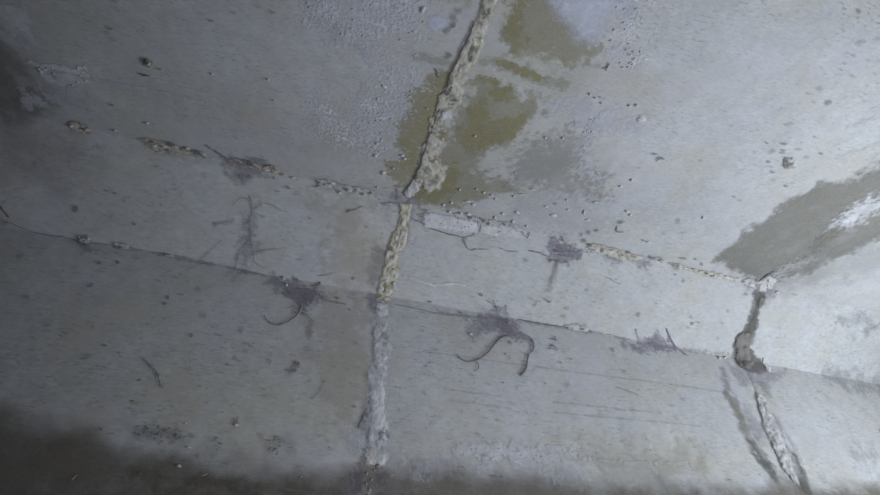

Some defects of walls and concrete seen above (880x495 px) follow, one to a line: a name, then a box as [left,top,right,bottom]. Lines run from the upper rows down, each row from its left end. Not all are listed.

water stain [0,2,205,111]
water stain [282,0,668,208]
water stain [713,171,880,279]
water stain [718,291,771,374]